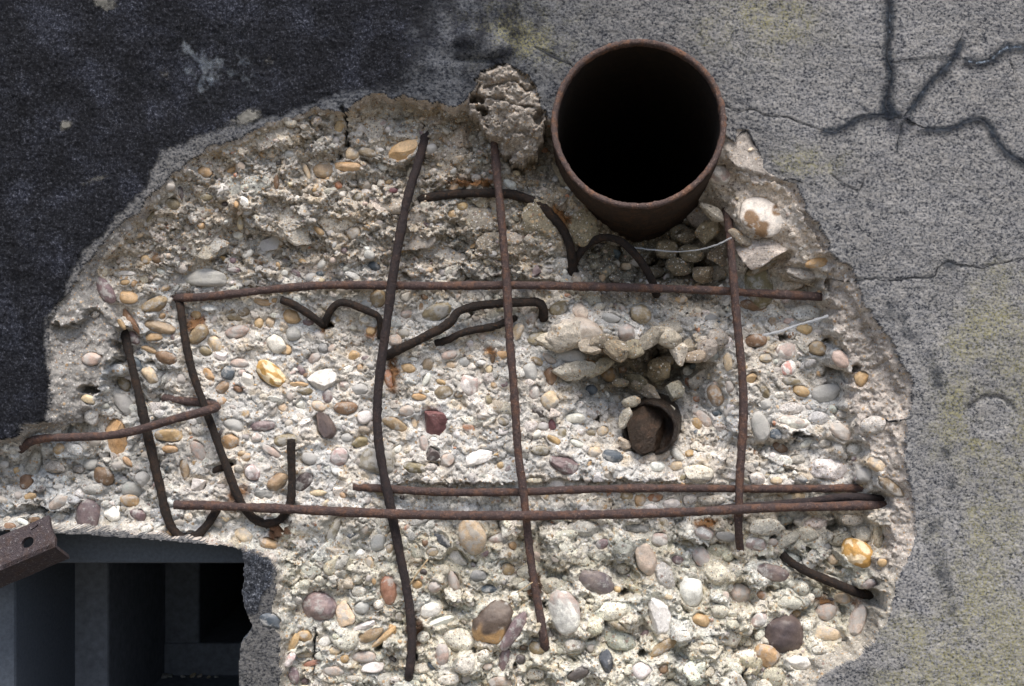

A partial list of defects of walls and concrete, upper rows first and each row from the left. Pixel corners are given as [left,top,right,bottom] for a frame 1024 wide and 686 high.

crack [728,0,1024,166]
damp [0,0,538,440]
crack [832,257,1024,282]
rust [186,315,205,331]
rust [388,358,400,394]
spalling [0,83,917,686]
rust [268,521,291,541]
rust [694,518,717,528]
rust [405,610,424,651]